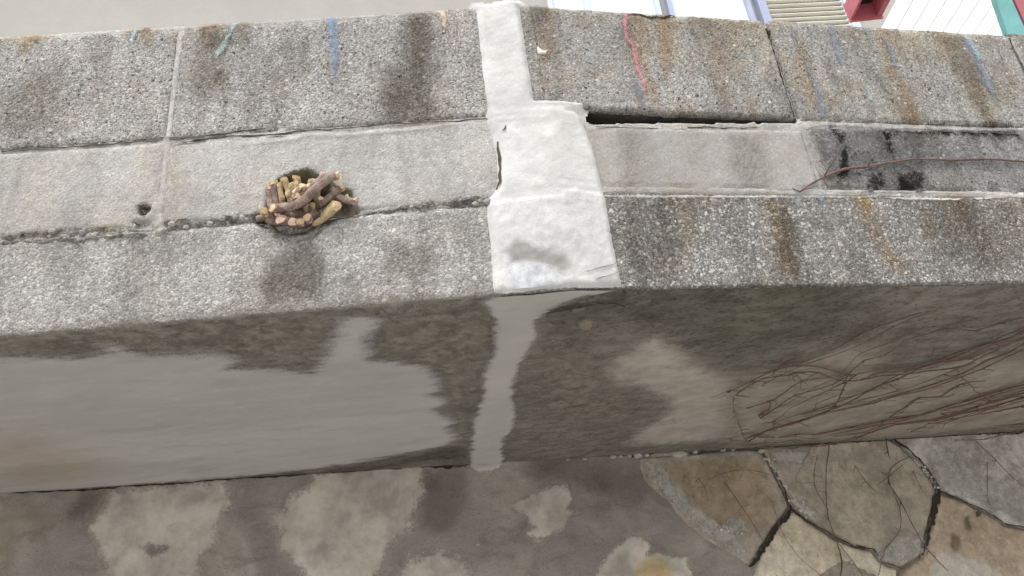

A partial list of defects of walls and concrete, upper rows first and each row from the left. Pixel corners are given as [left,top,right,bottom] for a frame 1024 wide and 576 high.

crack [1,118,506,191]
spalling [161,167,491,237]
mould [829,121,850,179]
damp [868,171,958,200]
damp [0,292,489,432]